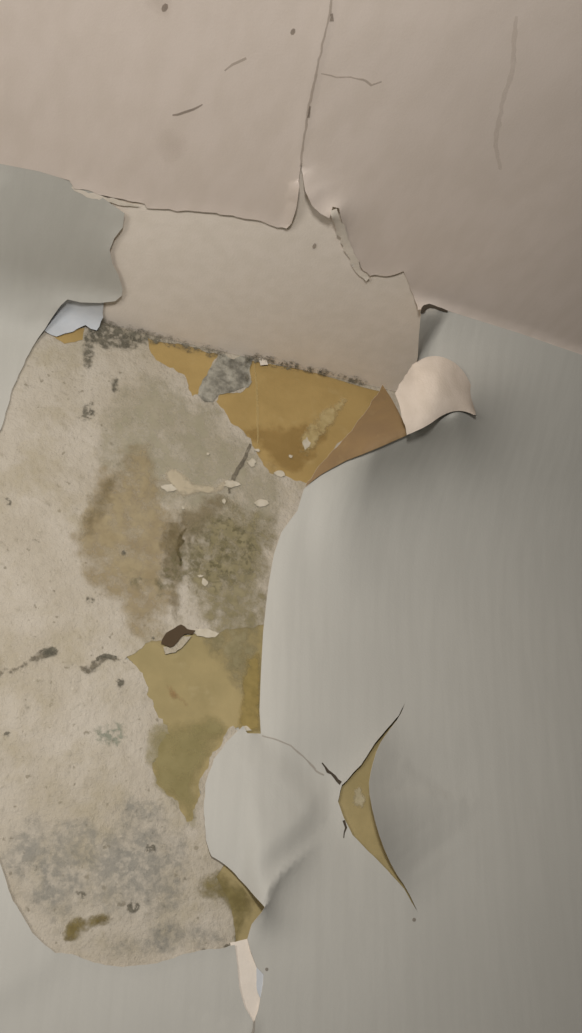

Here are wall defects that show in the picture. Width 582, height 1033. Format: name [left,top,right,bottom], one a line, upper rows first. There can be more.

mould [84,318,225,366]
mould [253,355,364,385]
water stain [82,384,274,685]
flaking render [0,164,582,967]